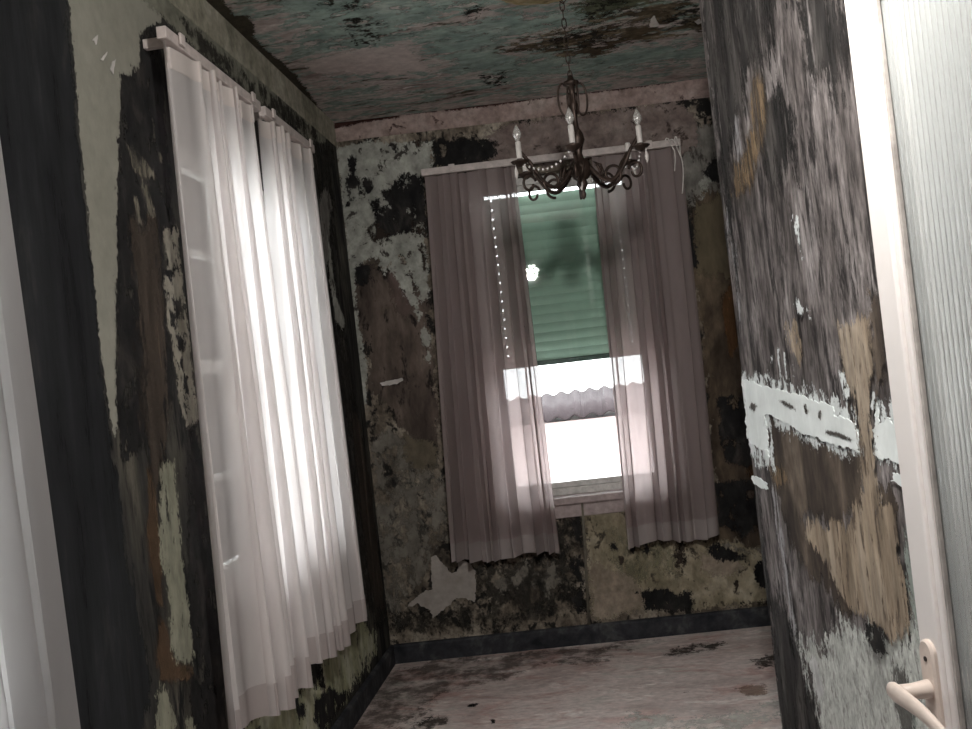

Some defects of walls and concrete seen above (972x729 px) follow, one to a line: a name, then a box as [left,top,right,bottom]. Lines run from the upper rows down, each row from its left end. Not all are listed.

peeling [206,0,443,114]
peeling [68,0,326,438]
flaking render [336,139,442,457]
leakage [492,0,928,729]
peeling [741,347,902,490]
peeling [158,458,195,665]
peeling [154,680,197,729]